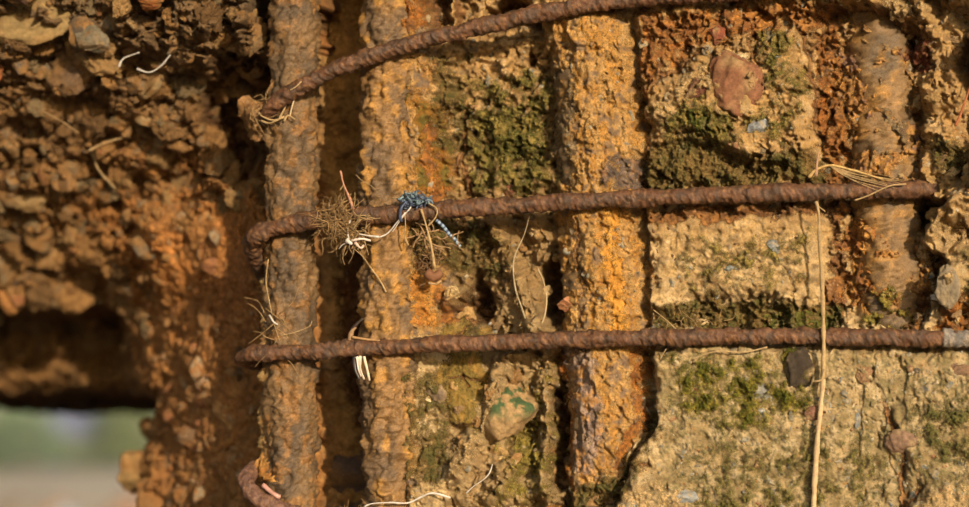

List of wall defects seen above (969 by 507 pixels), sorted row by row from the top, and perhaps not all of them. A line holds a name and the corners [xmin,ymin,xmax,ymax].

spalling [425,0,453,30]
spalling [850,1,931,51]
rust [402,44,460,202]
rust [548,0,936,193]
rust [406,225,476,337]
spalling [439,271,497,336]
spalling [545,260,565,327]
rust [551,199,969,332]
rust [253,362,277,495]
peeling [433,351,490,435]
spalling [548,382,571,491]
rust [546,345,656,507]